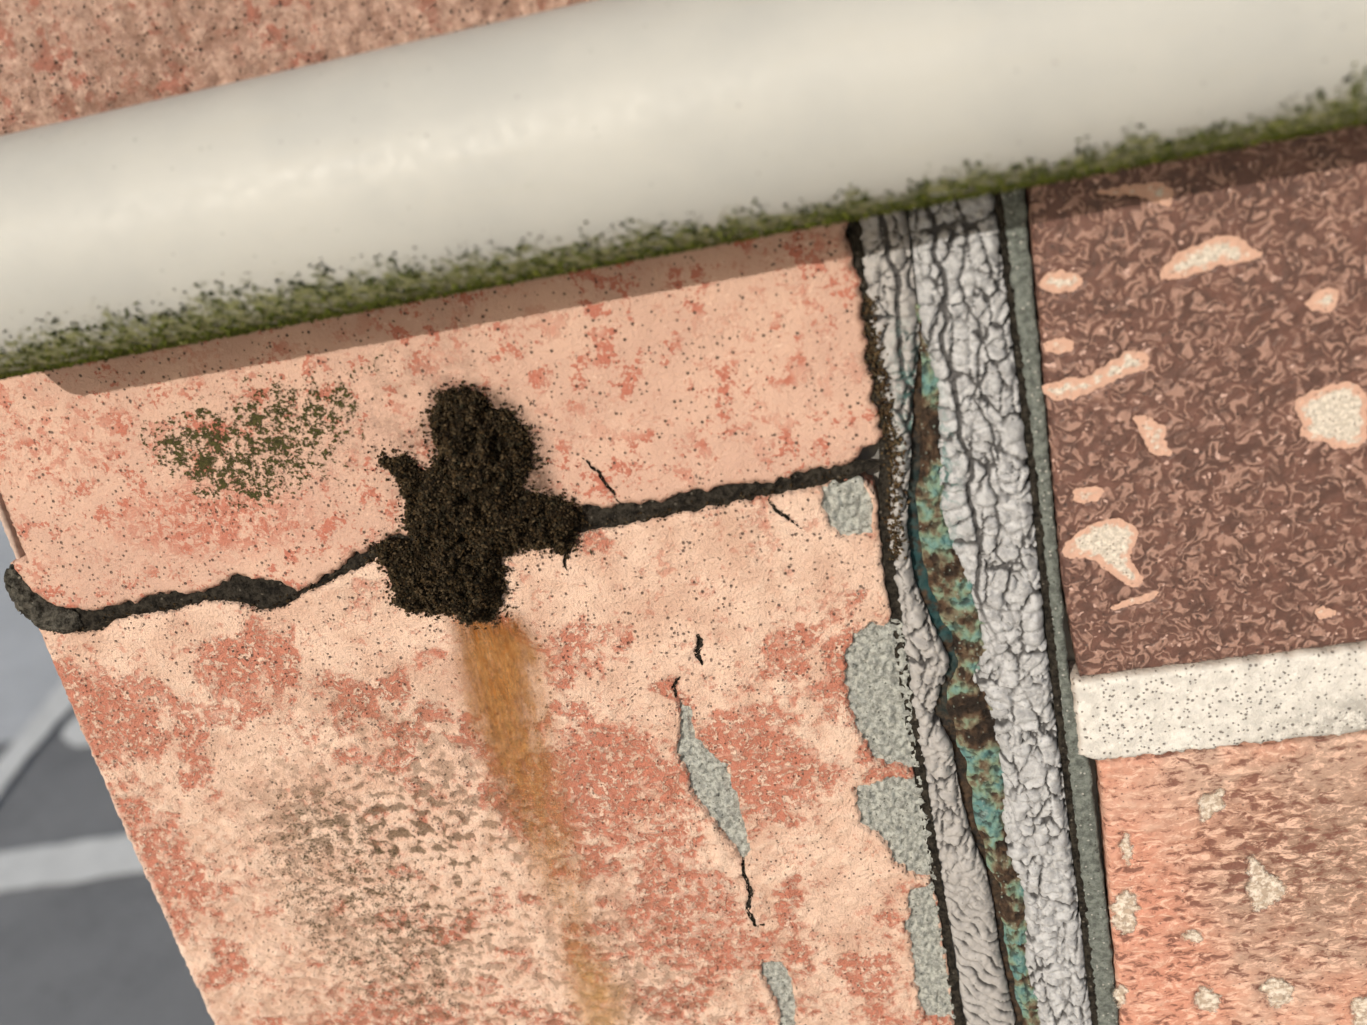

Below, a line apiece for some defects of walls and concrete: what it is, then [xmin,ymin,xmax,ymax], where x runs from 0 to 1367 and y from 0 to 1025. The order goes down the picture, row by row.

crack [4,534,414,636]
corrosion [457,617,554,841]
crack [563,304,1041,1025]
spalling [821,476,873,536]
spalling [843,618,956,1019]